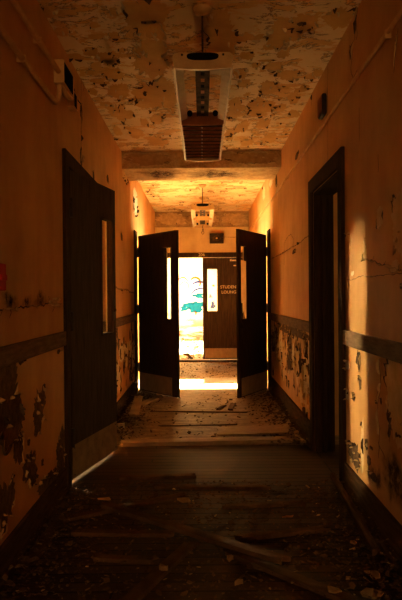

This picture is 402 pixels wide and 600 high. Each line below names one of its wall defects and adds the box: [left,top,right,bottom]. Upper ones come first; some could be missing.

peeling [67,38,177,166]
peeling [221,6,357,164]
crack [348,256,402,280]
flaking render [116,322,136,397]
flaking render [270,321,309,419]
flaking render [342,350,362,401]
flaking render [374,359,402,449]
flaking render [0,359,67,541]
peeling [345,420,377,482]